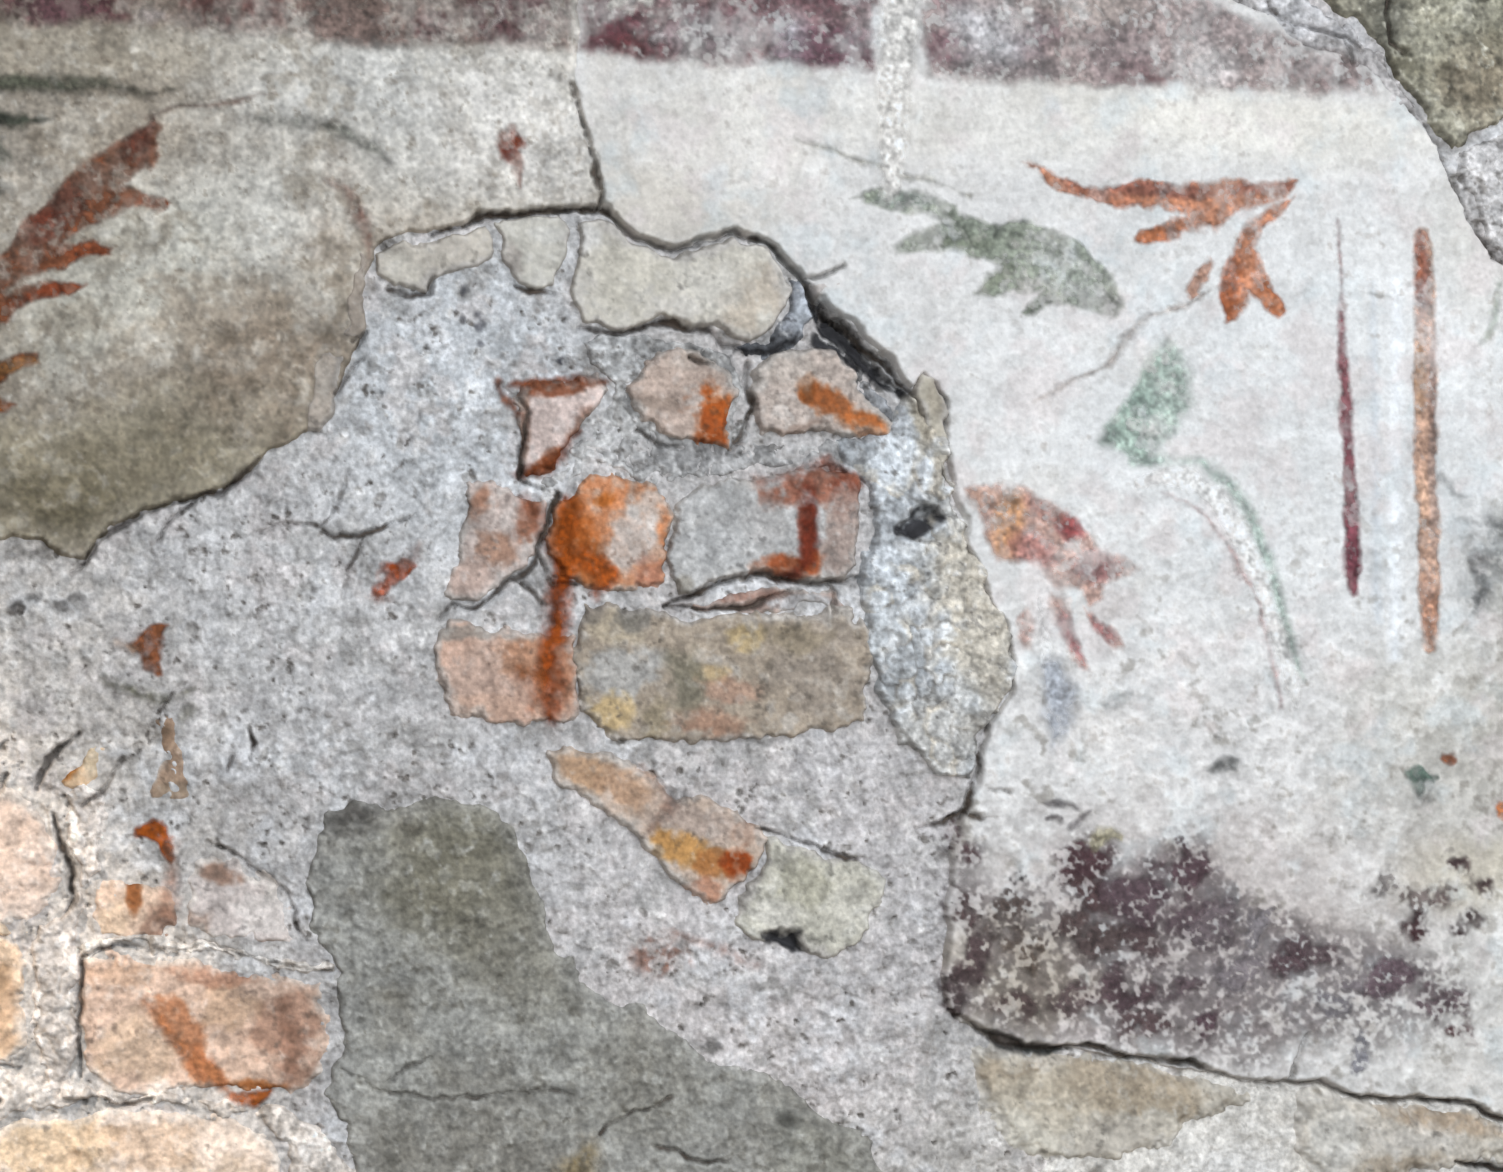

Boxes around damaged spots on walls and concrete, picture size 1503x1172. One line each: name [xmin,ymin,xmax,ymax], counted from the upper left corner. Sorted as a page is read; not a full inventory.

crack [436,164,611,233]
crack [515,287,547,295]
crack [586,319,721,363]
spalling [344,215,1018,959]
spalling [150,716,189,799]
spalling [0,747,356,1172]
peeling [939,841,1340,1036]
peeling [1373,874,1457,941]
peeling [1318,958,1469,1036]
crack [1060,1043,1128,1057]
crack [1378,1097,1503,1120]
crack [1455,1161,1503,1172]